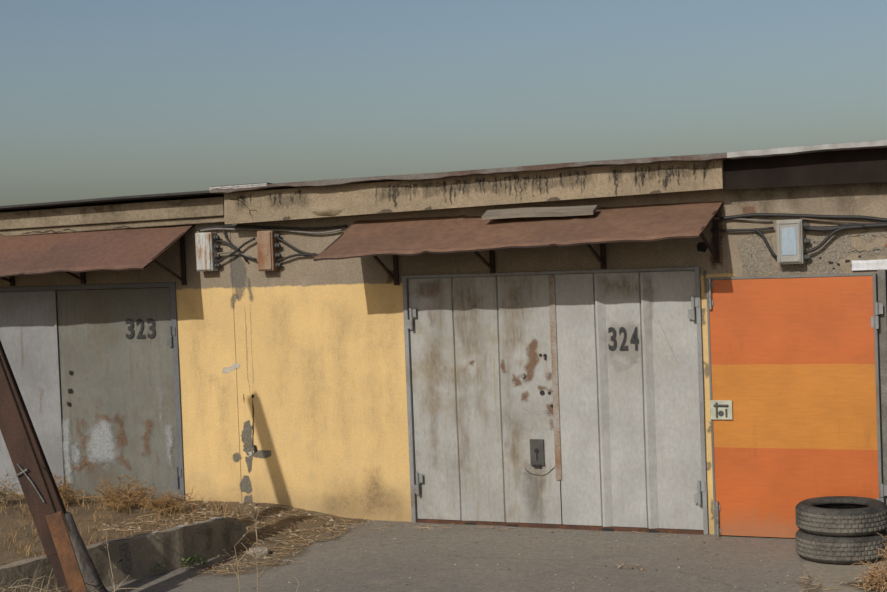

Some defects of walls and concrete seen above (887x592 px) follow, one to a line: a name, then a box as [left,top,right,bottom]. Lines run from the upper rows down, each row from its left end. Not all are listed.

water stain [443,175,548,202]
water stain [634,165,680,187]
spalling [738,230,887,276]
rust [513,340,553,399]
spalling [233,420,271,503]